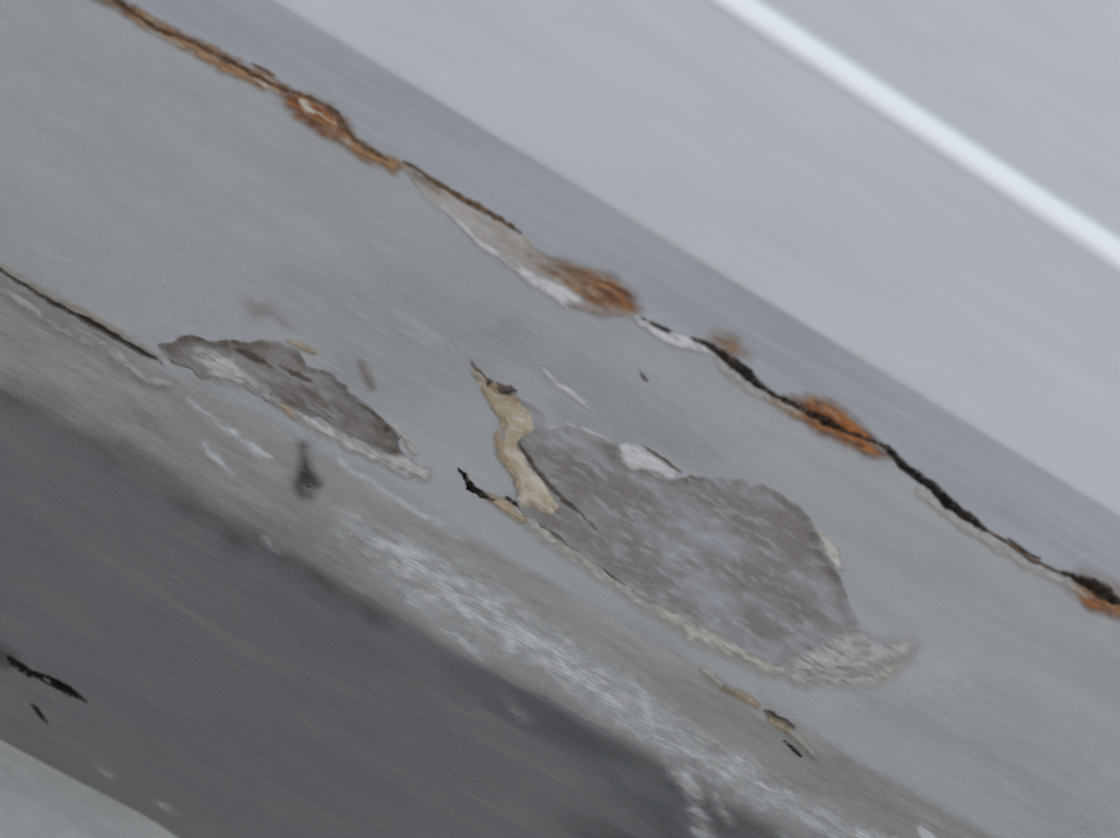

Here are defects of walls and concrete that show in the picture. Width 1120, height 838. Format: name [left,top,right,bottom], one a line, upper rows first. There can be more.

corrosion [101,0,402,172]
crack [112,0,522,234]
crack [0,269,172,387]
corrosion [545,266,636,313]
spalling [388,158,798,412]
spalling [158,335,430,481]
crack [457,467,527,523]
spalling [469,359,915,685]
corrosion [769,396,887,456]
crack [640,318,1120,605]
corrosion [1077,588,1120,615]
crack [6,656,87,724]